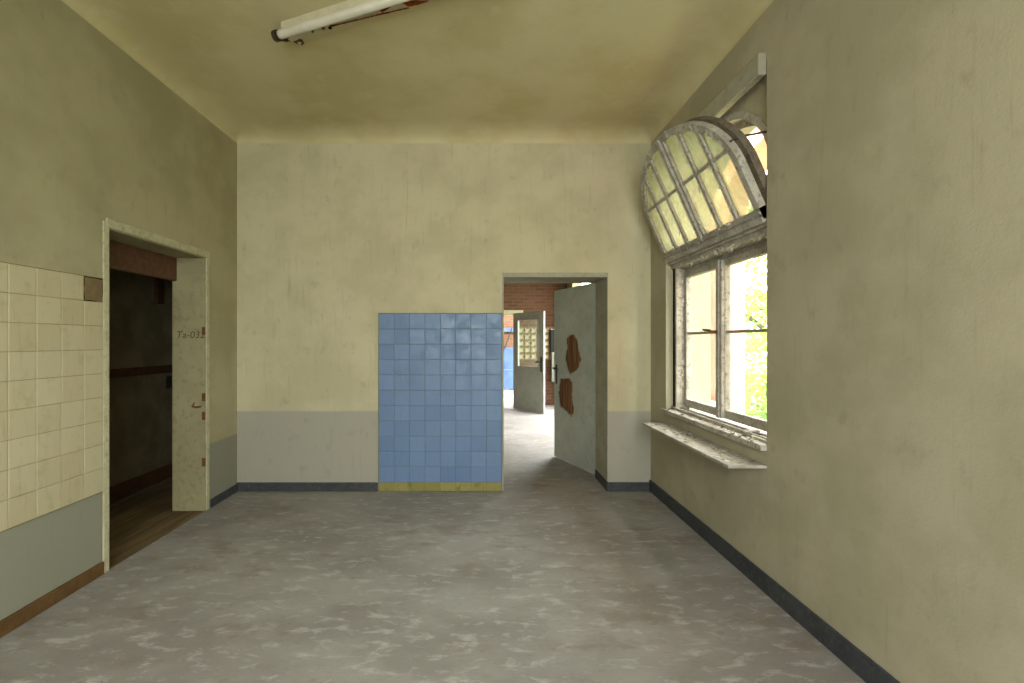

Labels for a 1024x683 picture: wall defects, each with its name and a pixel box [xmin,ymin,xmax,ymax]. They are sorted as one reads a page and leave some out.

peeling [84,276,103,302]